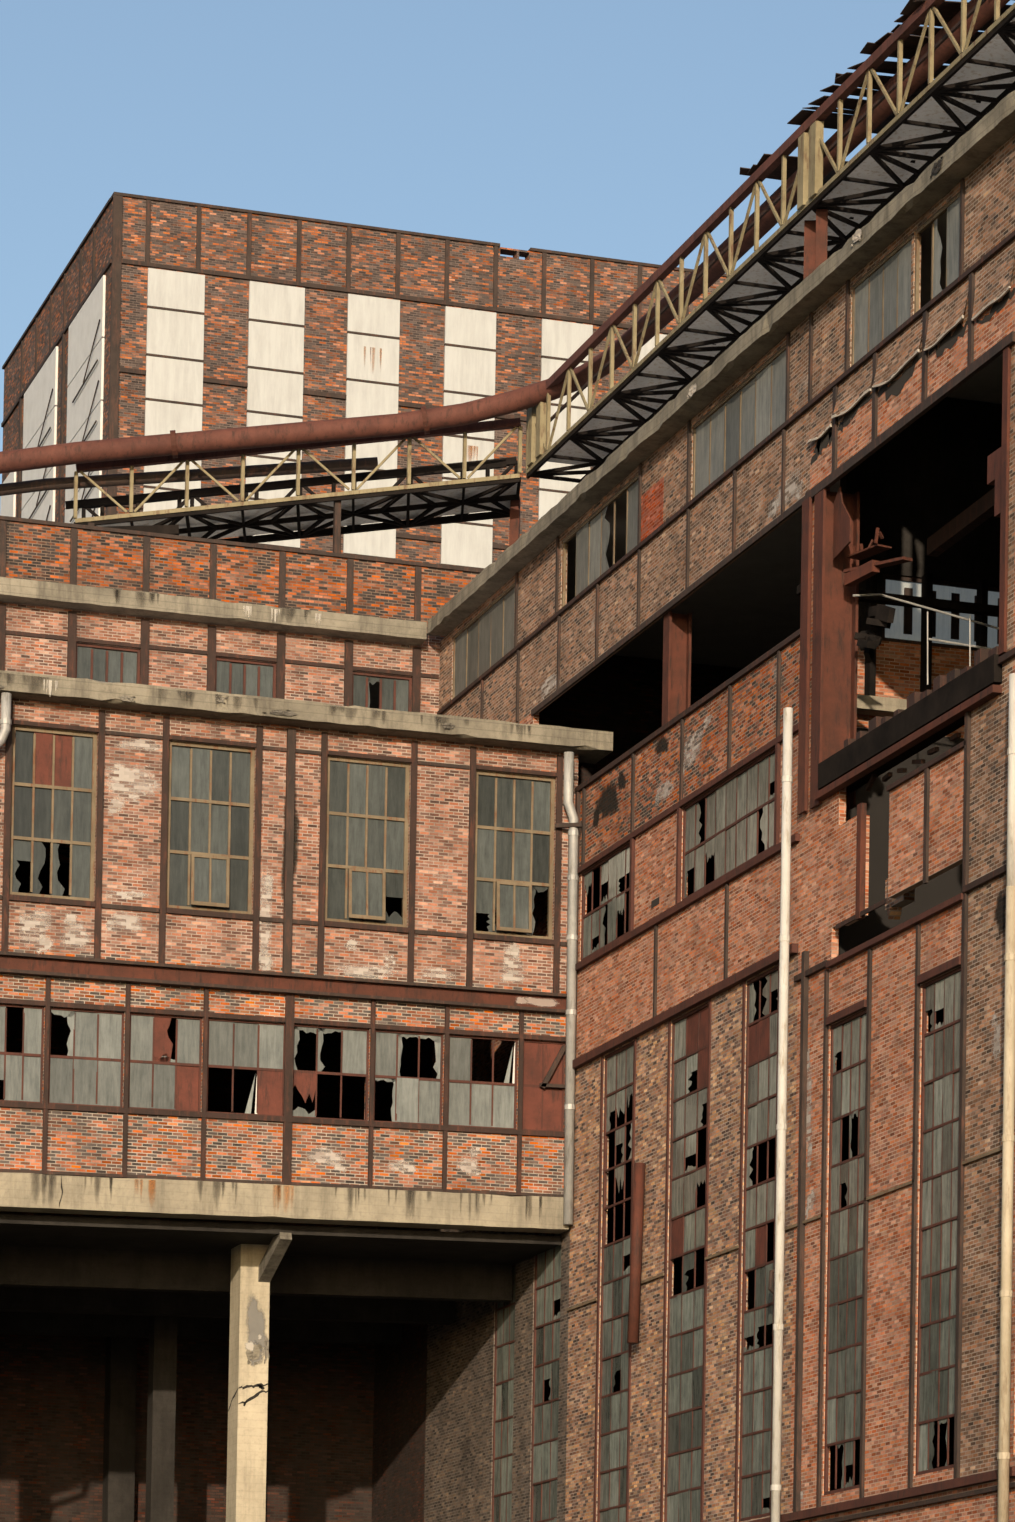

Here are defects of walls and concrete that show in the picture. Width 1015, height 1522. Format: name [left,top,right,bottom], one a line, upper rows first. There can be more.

water stain [122,739,158,750]
water stain [109,764,157,813]
water stain [107,891,145,931]
water stain [19,911,90,954]
water stain [311,1148,365,1202]
spalling [246,1337,270,1364]
crack [228,1383,268,1411]